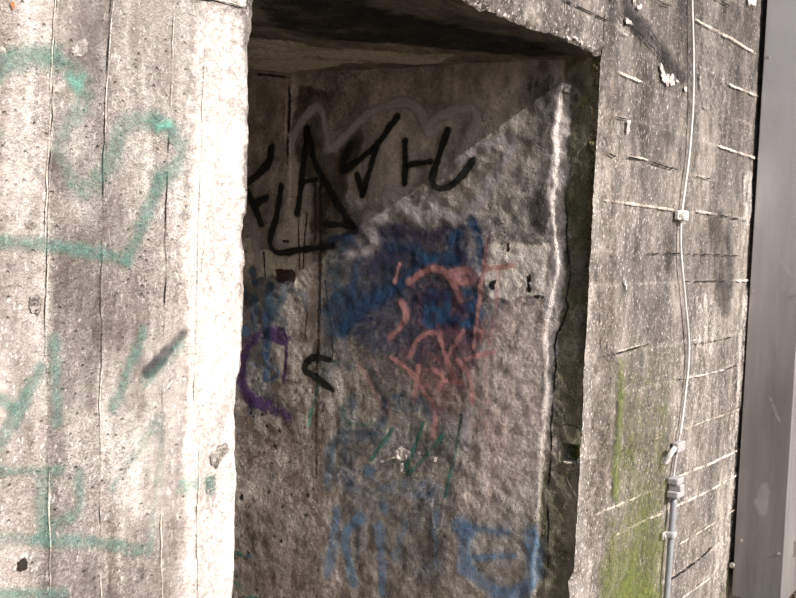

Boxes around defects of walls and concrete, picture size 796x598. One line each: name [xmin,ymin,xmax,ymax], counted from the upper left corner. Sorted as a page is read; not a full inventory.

crack [44,0,58,350]
crack [97,259,105,453]
crack [102,0,114,194]
crack [161,171,169,334]
crack [203,0,250,9]
leakage [177,0,564,598]
leakage [456,79,584,522]
crack [547,199,584,569]
leakage [623,0,685,81]
crack [45,475,53,557]
crack [157,502,165,596]